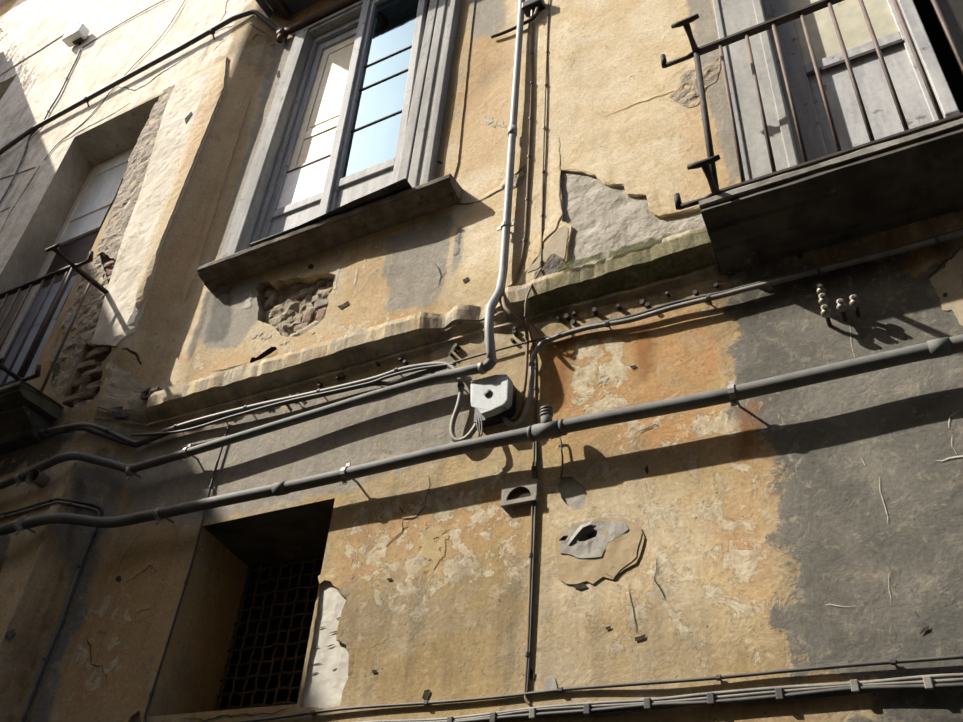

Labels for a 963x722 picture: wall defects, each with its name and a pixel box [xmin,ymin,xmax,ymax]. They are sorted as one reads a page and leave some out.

spalling [514,137,705,286]
spalling [49,85,175,420]
spalling [243,264,349,337]
peeling [929,249,963,326]
spalling [246,347,278,365]
spalling [578,528,597,541]
spalling [300,574,355,709]